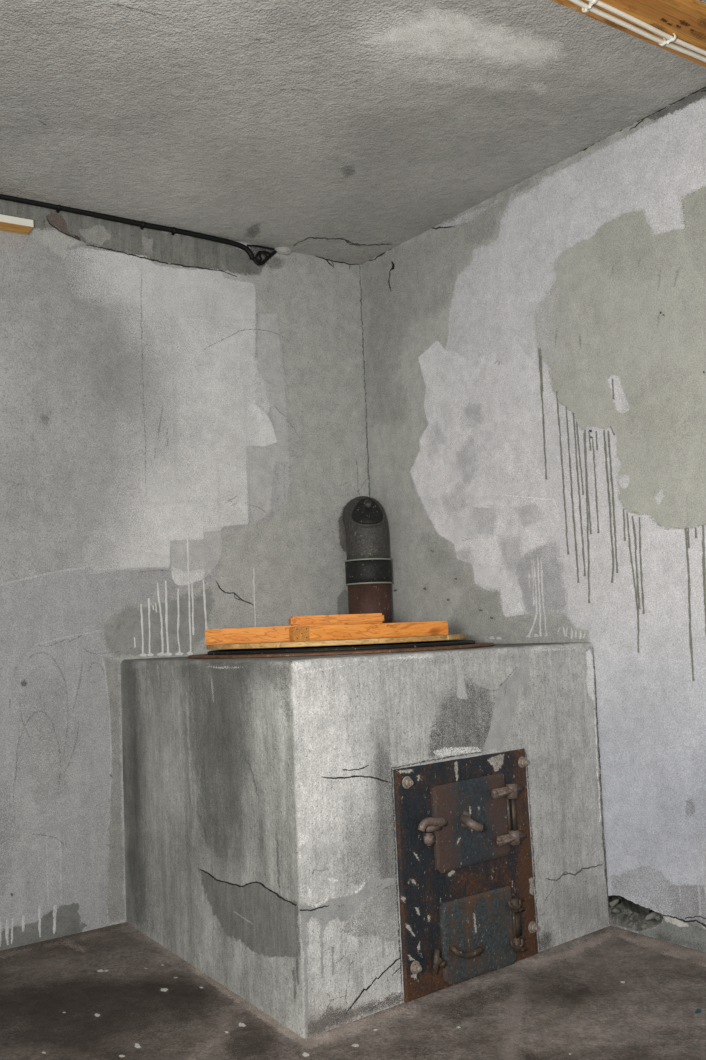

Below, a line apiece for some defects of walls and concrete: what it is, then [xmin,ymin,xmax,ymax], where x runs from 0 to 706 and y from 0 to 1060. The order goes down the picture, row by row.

crack [579,87,706,152]
flaking render [0,177,590,663]
crack [294,237,395,496]
damp [515,186,706,681]
crack [200,834,339,924]
crack [323,752,481,1014]
crack [525,648,610,950]
spalling [608,895,682,931]
crack [664,915,706,927]